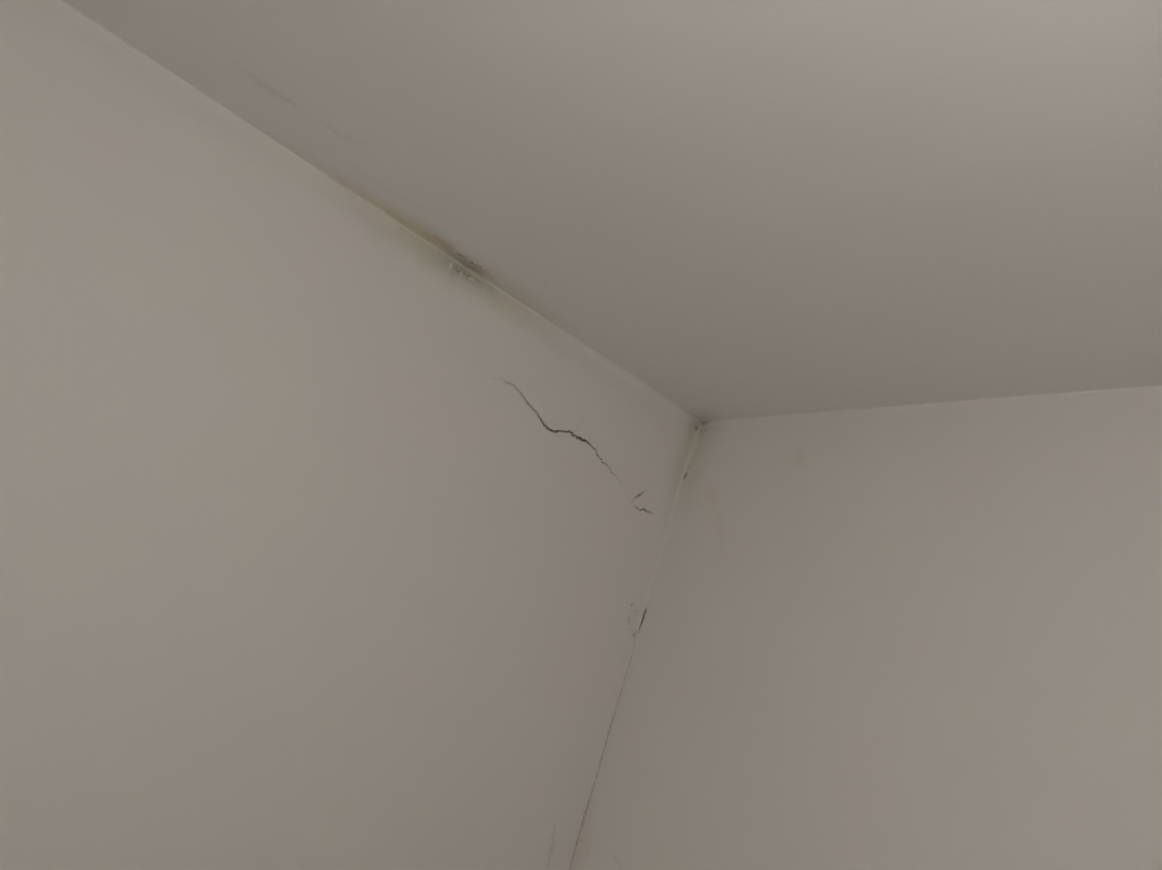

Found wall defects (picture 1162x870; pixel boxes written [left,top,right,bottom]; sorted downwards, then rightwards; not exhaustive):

crack [538,414,607,465]